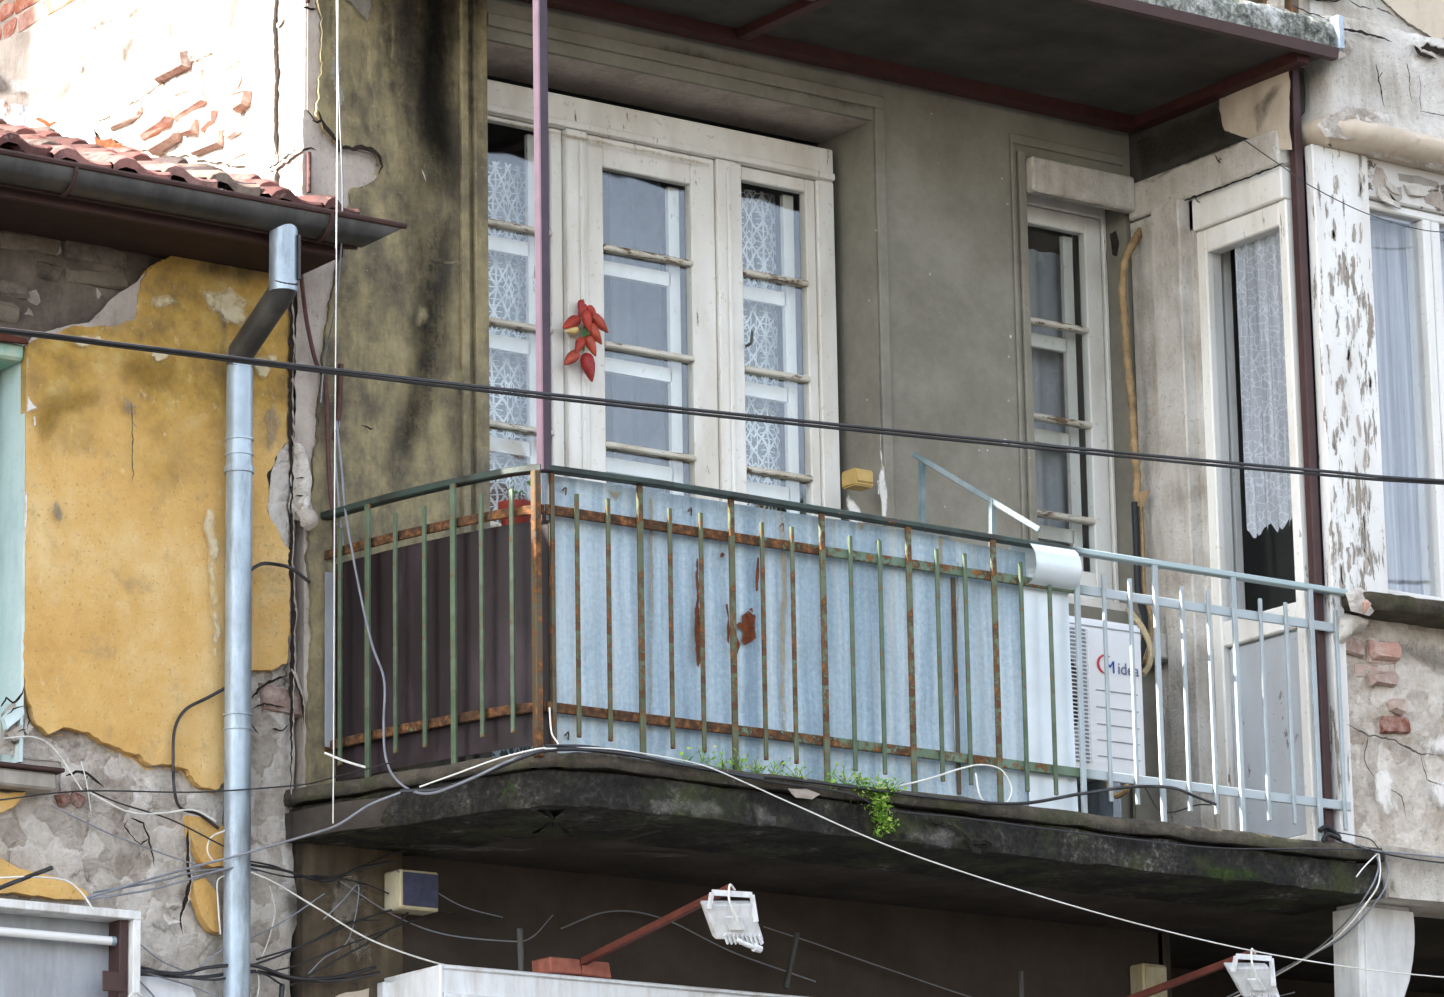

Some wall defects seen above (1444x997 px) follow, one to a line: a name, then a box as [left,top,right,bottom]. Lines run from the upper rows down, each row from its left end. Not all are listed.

leakage [0,0,227,96]
spalling [94,49,252,166]
peeling [204,290,246,323]
spalling [293,259,336,472]
spalling [302,109,379,211]
leakage [396,219,450,478]
leakage [382,0,478,187]
peeling [1331,175,1363,285]
peeling [1326,294,1373,469]
corrosion [726,604,756,653]
spalling [1331,488,1444,851]
spalling [0,703,224,997]